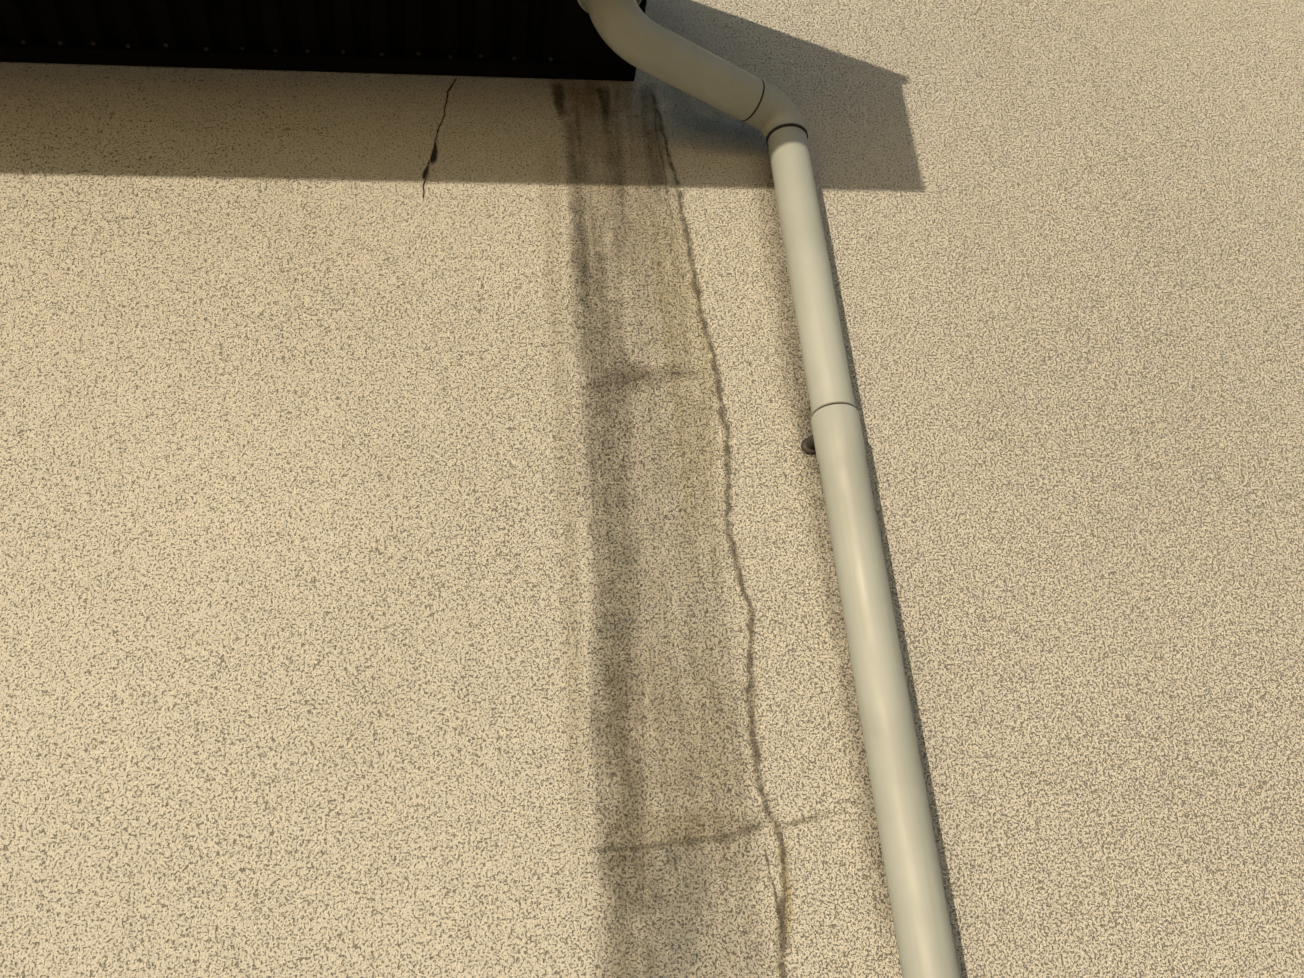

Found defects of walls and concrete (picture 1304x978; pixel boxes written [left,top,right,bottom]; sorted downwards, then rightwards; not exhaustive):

crack [422,78,457,199]
crack [653,96,786,978]